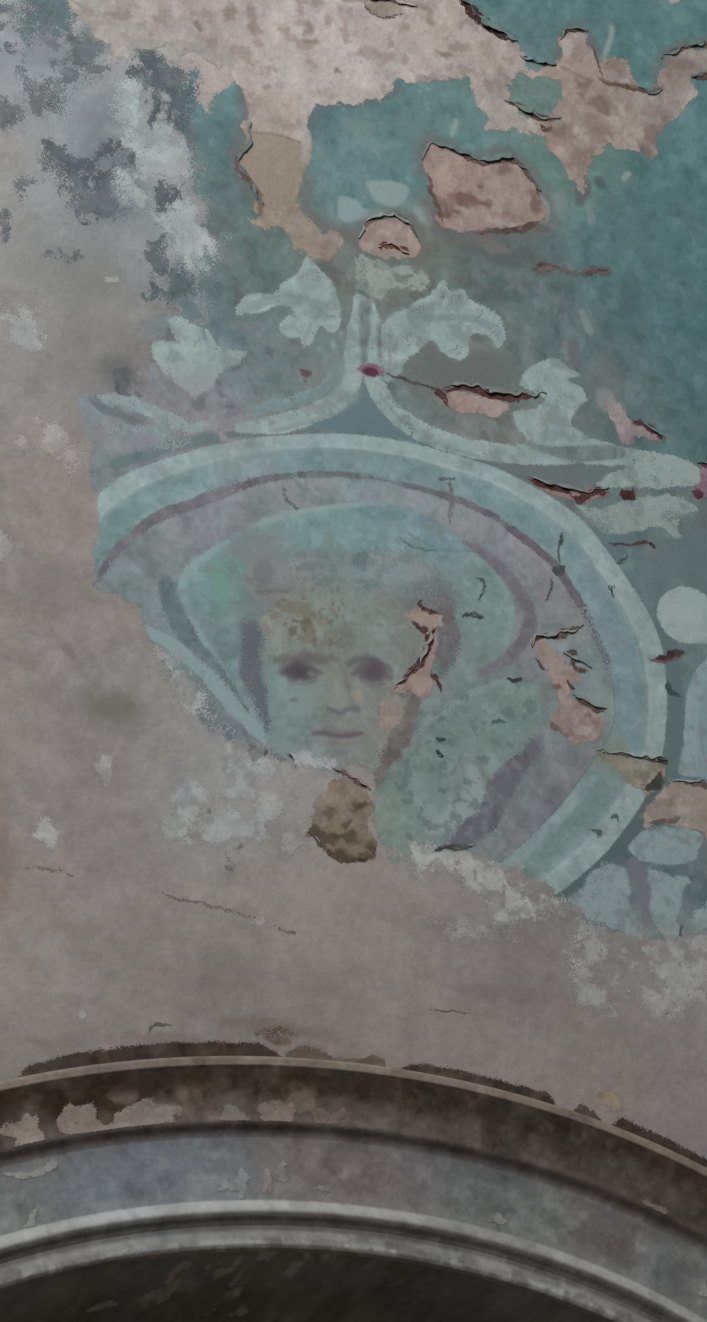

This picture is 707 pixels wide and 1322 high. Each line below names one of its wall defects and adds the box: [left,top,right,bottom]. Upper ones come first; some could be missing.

water stain [0,0,232,309]
peeling [68,0,707,264]
peeling [431,381,546,418]
peeling [604,397,666,448]
peeling [375,582,462,730]
peeling [530,623,707,839]
water stain [392,835,707,1043]
water stain [11,1025,556,1105]
peeling [3,1158,59,1180]
peeling [0,1097,183,1146]
peeling [218,1099,347,1125]
water stain [574,1104,707,1168]